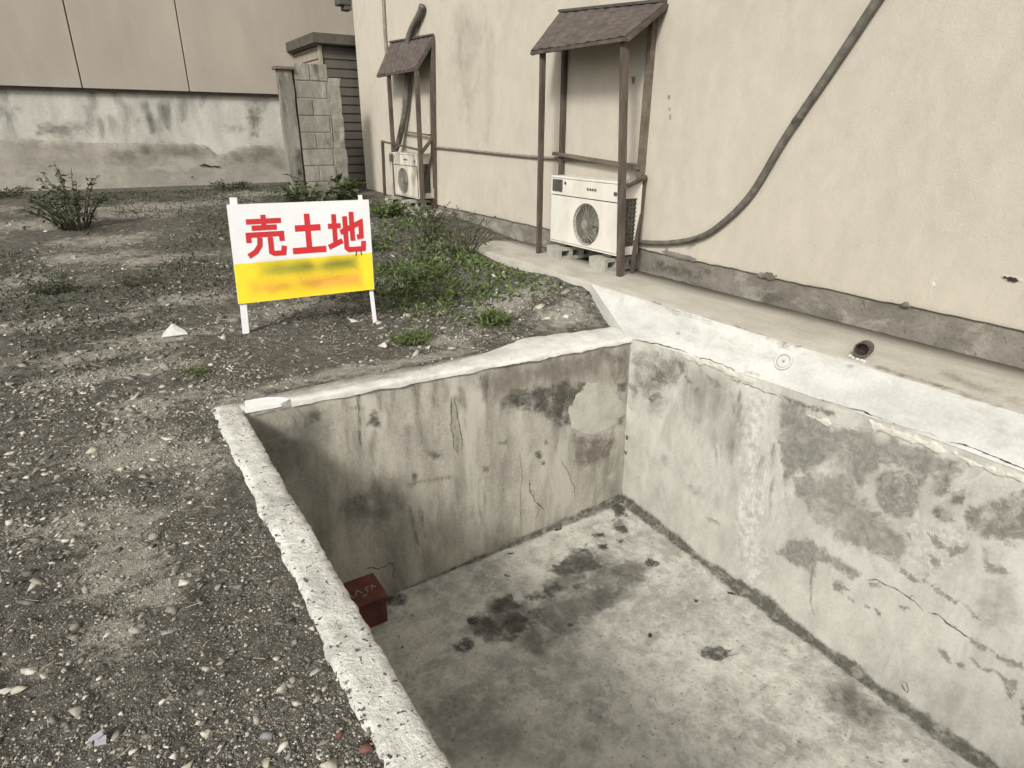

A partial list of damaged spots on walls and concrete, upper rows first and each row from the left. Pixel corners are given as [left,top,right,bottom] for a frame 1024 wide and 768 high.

spalling [756,272,777,280]
crack [450,397,463,449]
water stain [495,360,599,424]
crack [520,459,543,522]
spalling [210,284,1024,768]
water stain [966,501,1024,539]
water stain [444,401,997,768]
crack [867,579,969,638]